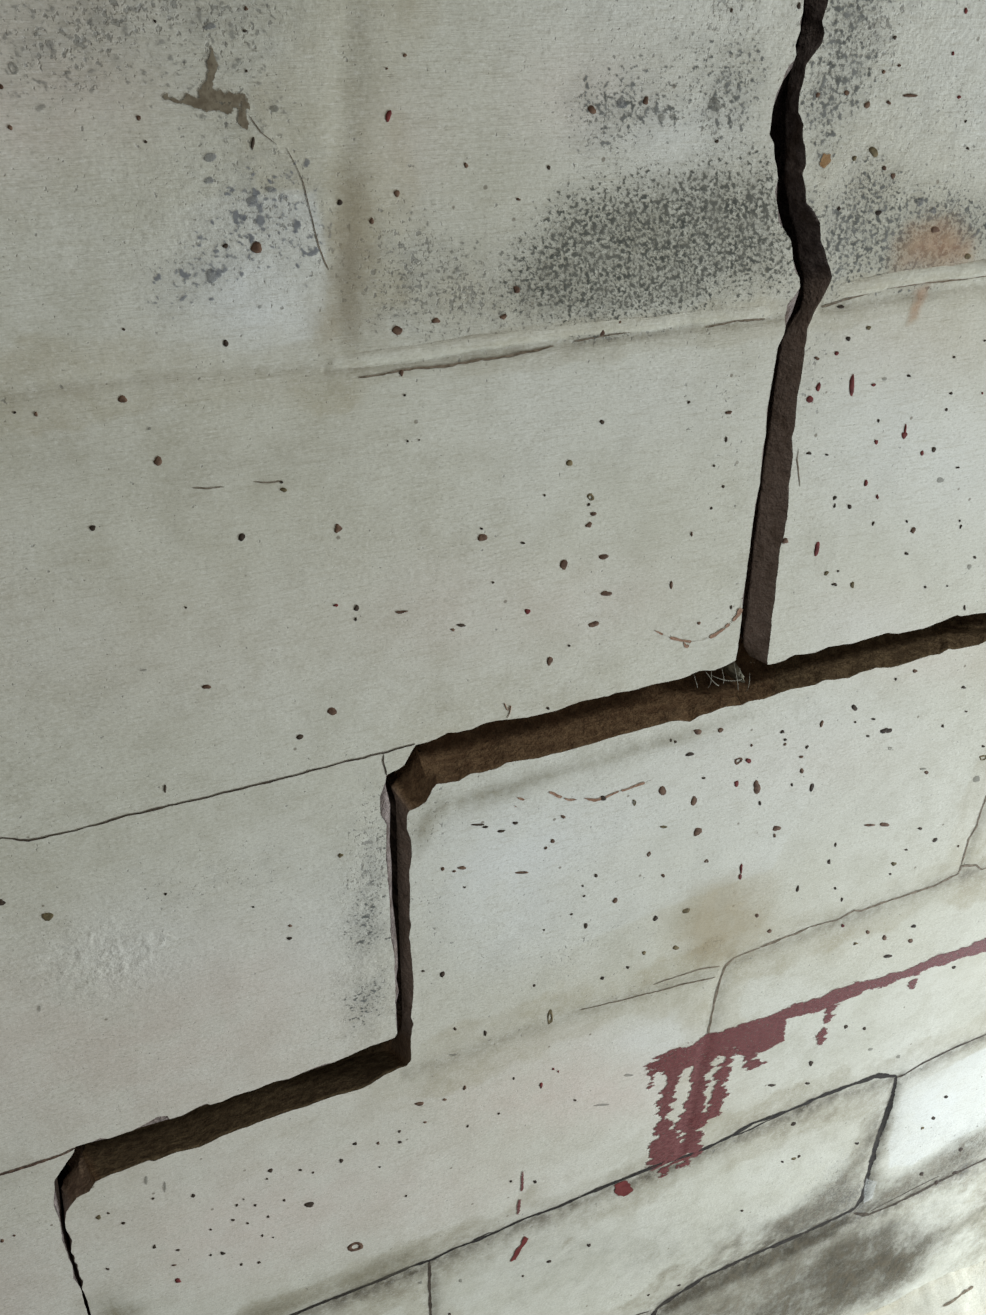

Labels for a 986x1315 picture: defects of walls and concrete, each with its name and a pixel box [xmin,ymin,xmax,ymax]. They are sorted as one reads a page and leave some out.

mould [799,0,892,170]
crack [250,117,329,270]
mould [493,33,797,342]
mould [805,155,986,303]
crack [358,332,630,378]
crack [706,318,764,328]
crack [727,0,986,705]
crack [0,668,742,1315]
crack [581,798,986,1039]
crack [291,1034,986,1315]
damp [670,1173,918,1315]